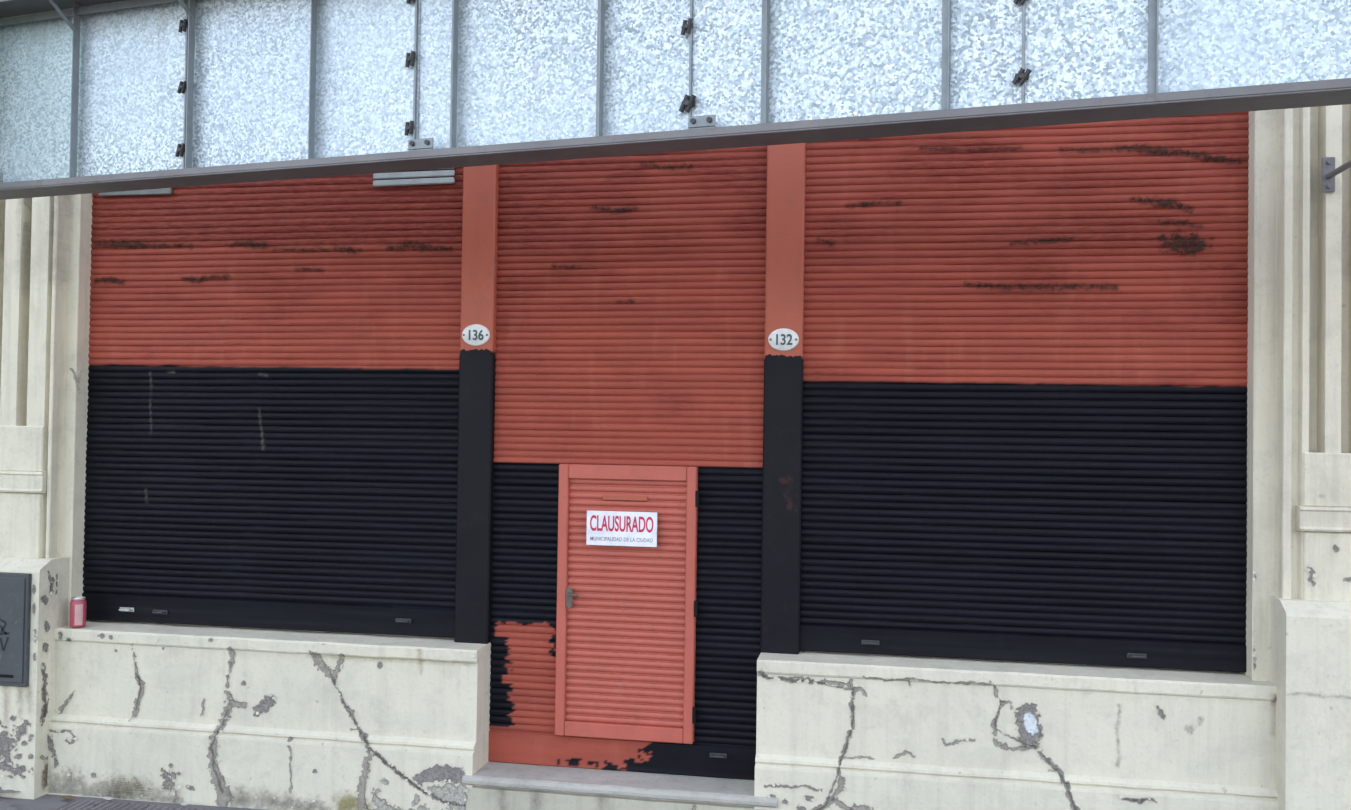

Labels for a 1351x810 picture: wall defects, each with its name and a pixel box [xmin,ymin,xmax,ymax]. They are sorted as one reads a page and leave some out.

flaking render [0,714,77,789]
crack [128,649,145,722]
crack [201,647,247,807]
flaking render [253,693,276,717]
crack [309,651,466,810]
flaking render [370,764,468,810]
crack [758,671,1080,810]
crack [1116,711,1157,804]